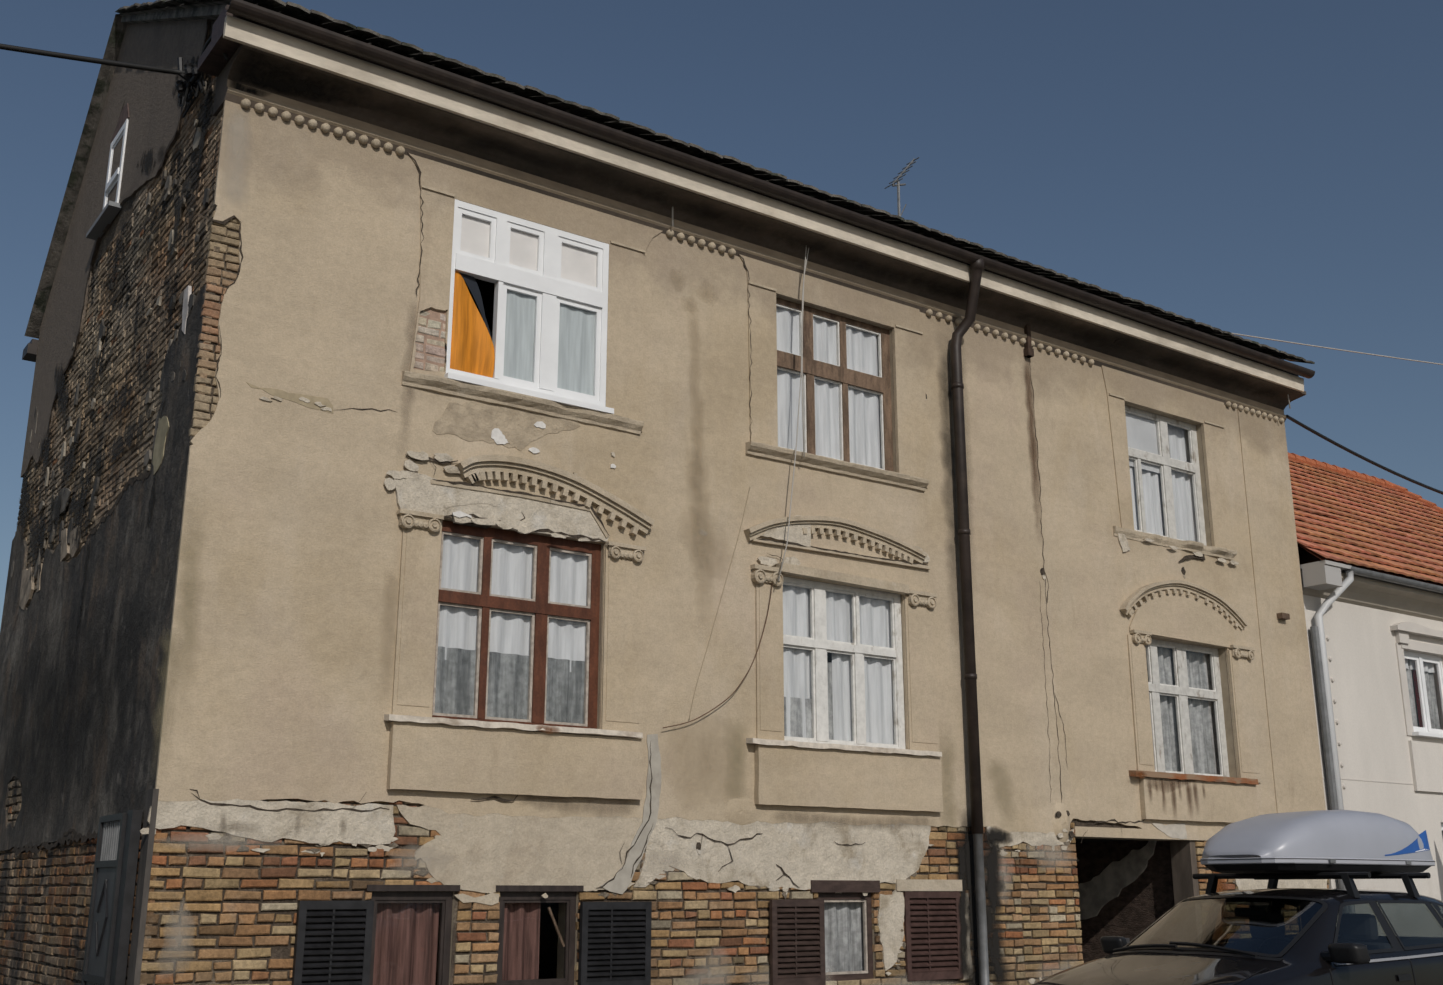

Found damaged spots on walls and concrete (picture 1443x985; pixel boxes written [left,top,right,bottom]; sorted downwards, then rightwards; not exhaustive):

flaking render [10,73,241,610]
crack [341,406,396,414]
flaking render [413,308,446,372]
crack [740,256,752,439]
water stain [18,366,164,641]
peeling [384,451,590,541]
crack [1029,358,1068,803]
flaking render [0,837,97,985]
peeling [125,799,1157,985]
crack [598,743,799,888]
crack [1081,819,1145,843]
peeling [1195,841,1330,895]